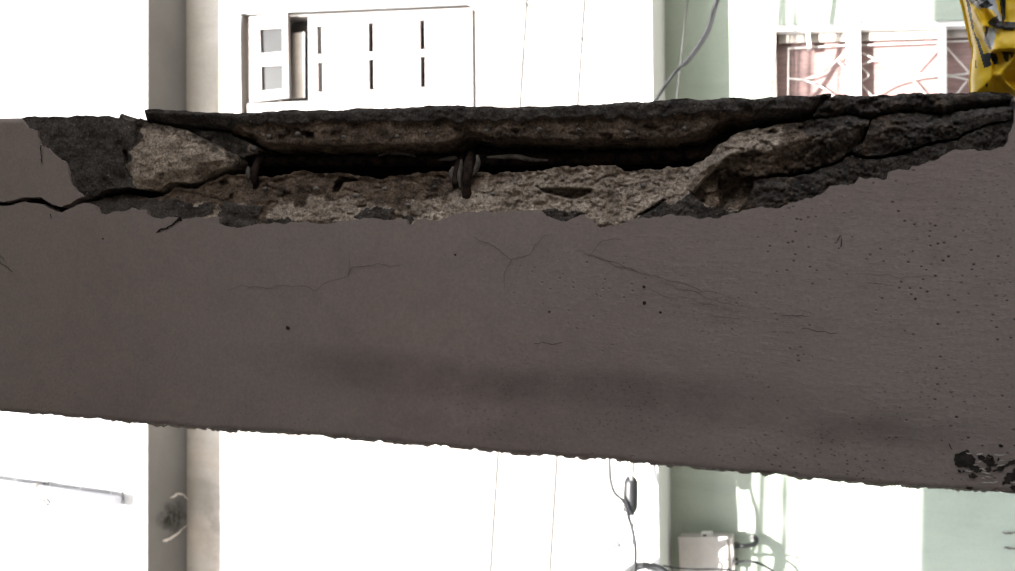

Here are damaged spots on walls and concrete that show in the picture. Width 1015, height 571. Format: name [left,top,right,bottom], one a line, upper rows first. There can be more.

spalling [20,92,1014,228]
crack [0,199,70,218]
spalling [111,420,307,436]
spalling [323,435,1015,494]